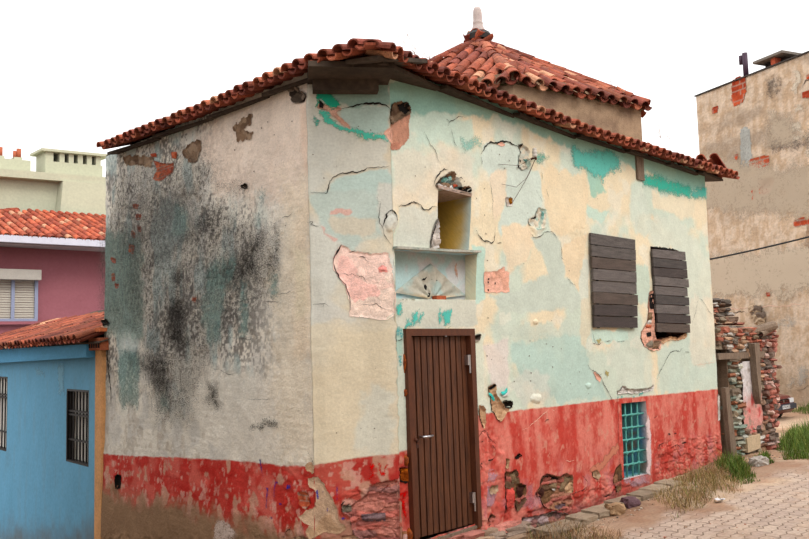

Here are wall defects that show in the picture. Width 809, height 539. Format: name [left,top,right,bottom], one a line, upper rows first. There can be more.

flaking render [731,76,746,106]
crack [311,166,388,194]
spalling [528,207,547,230]
flaking render [793,217,809,227]
mould [96,145,288,434]
peeling [333,245,396,320]
peeling [484,267,510,293]
flaking render [640,291,687,351]
spalling [617,385,654,394]
spalling [478,381,515,429]
peeling [266,462,346,539]
peeling [489,485,515,511]